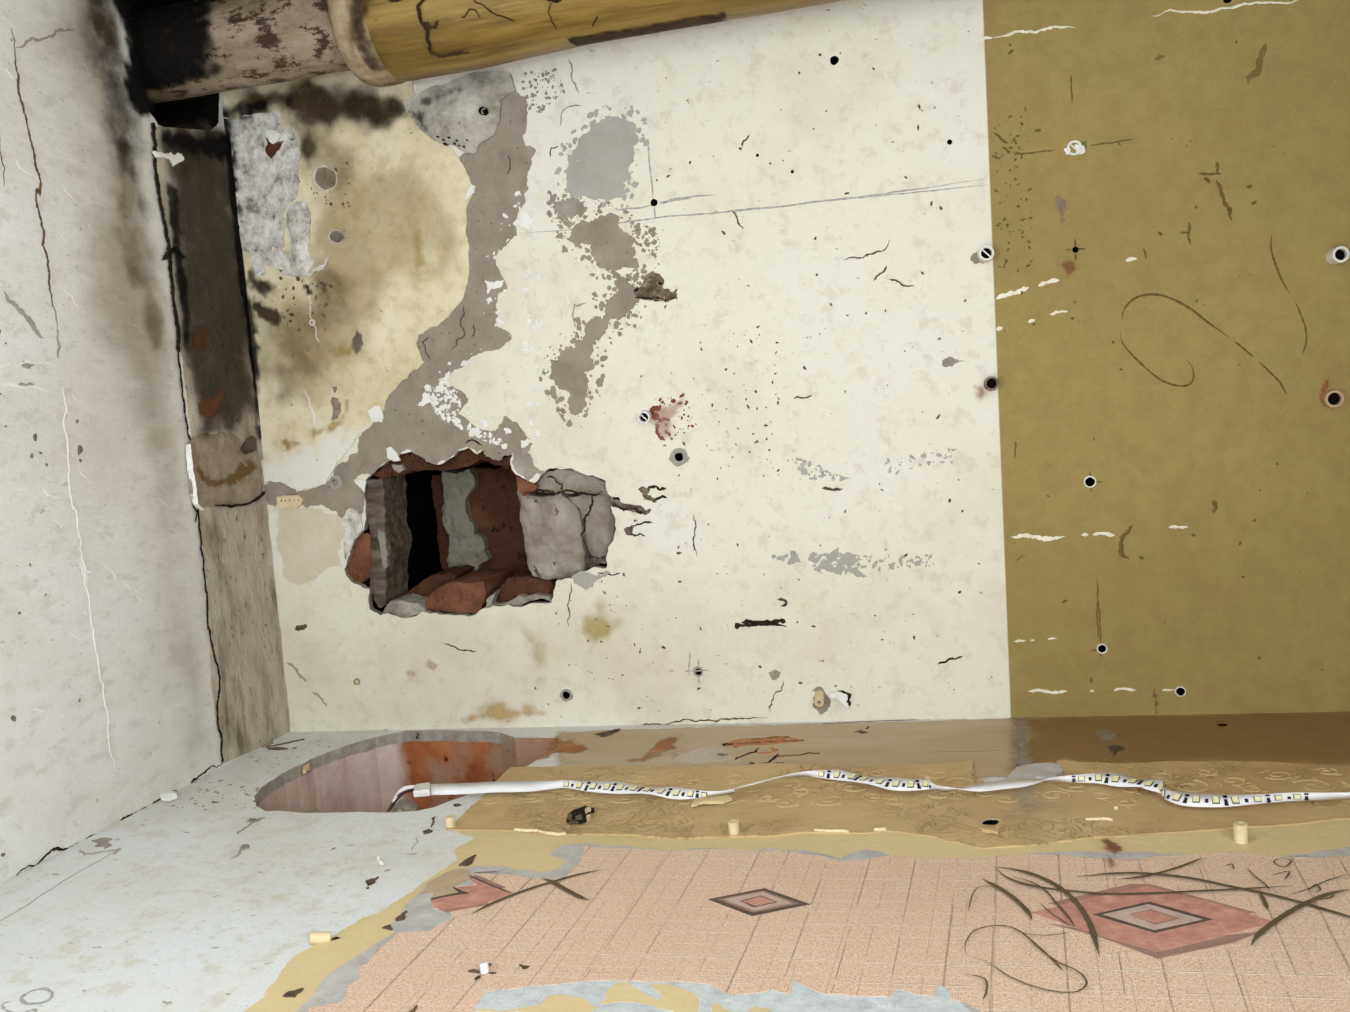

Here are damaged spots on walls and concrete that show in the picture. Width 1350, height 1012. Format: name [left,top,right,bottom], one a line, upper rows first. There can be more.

crack [151,122,191,441]
leakage [279,273,342,331]
peeling [186,68,677,585]
spalling [663,442,690,477]
crack [0,503,224,921]